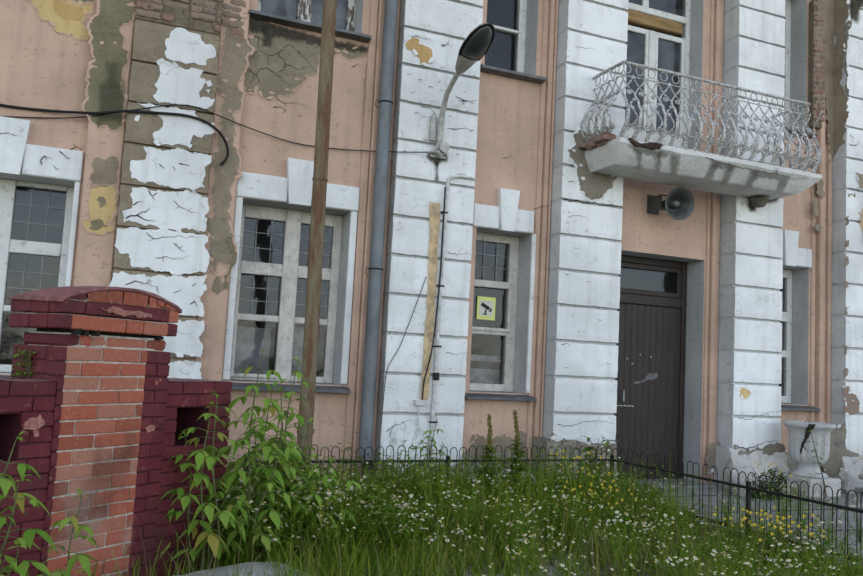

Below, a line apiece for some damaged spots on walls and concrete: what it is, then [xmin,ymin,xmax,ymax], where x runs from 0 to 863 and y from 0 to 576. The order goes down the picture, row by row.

crack [248,36,309,113]
peeling [334,42,368,62]
peeling [406,35,445,68]
peeling [808,0,863,163]
peeling [27,0,321,379]
flaking render [566,128,664,202]
peeling [848,171,863,197]
peeling [23,415,45,437]
peeling [733,441,787,460]
flaking render [822,368,860,478]